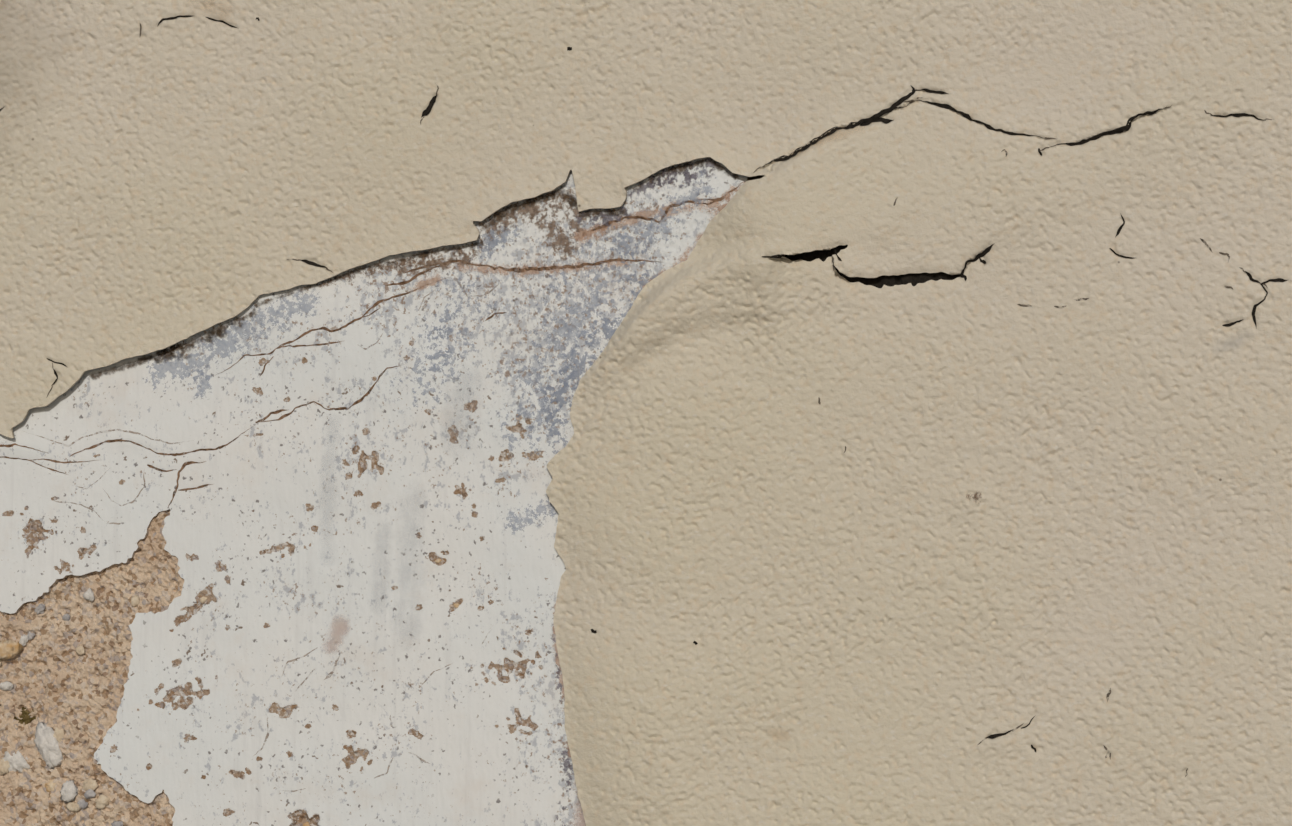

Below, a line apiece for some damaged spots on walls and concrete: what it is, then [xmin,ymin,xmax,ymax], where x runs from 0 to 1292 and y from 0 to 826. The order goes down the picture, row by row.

crack [140,15,237,36]
crack [1205,111,1272,121]
crack [0,86,1170,525]
crack [1200,238,1287,327]
peeling [0,157,748,826]